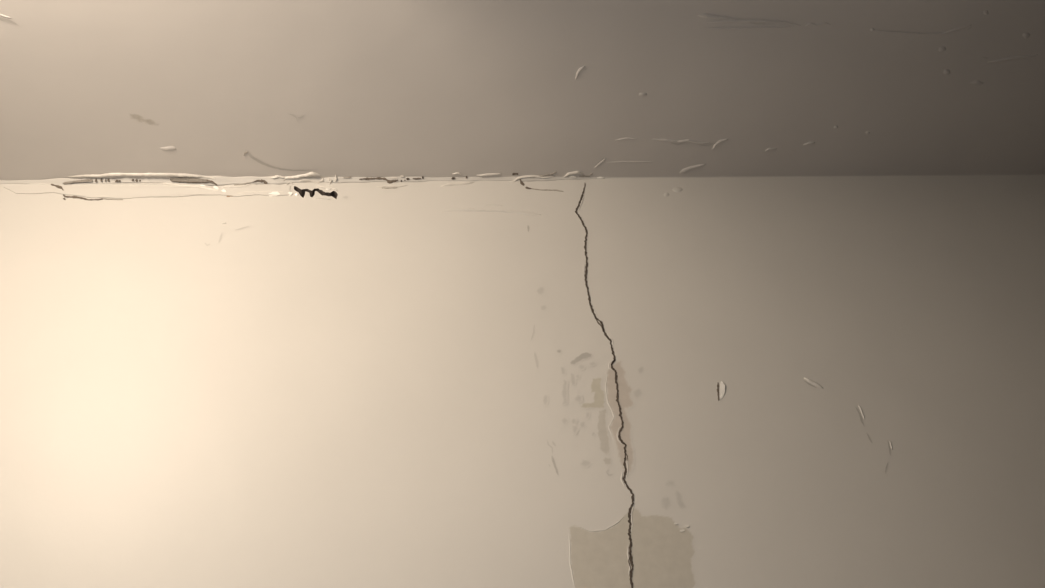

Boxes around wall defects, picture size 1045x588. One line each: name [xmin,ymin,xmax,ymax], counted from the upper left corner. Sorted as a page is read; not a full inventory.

crack [51,178,141,200]
crack [243,149,317,184]
crack [343,176,424,189]
crack [509,172,635,588]
peeling [568,507,697,588]